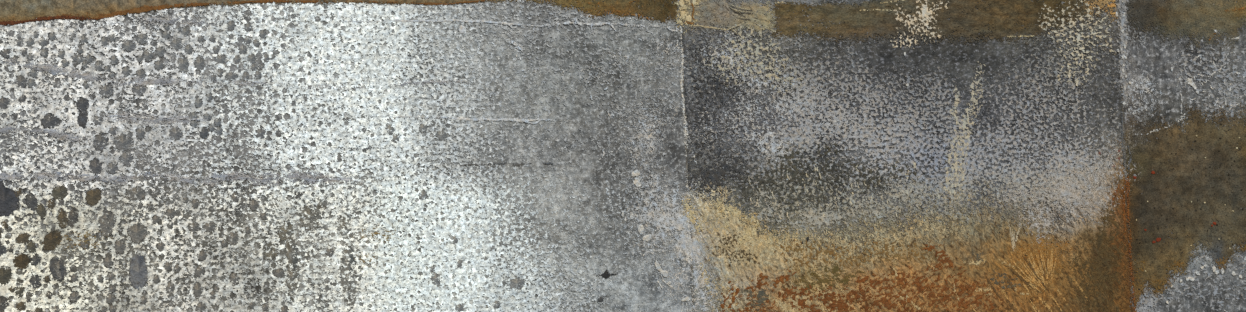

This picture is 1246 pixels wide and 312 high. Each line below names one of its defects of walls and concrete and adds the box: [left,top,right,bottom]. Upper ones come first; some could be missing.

rust [0,0,678,26]
leakage [0,0,771,312]
rust [678,139,1185,312]
leakage [666,0,1246,312]